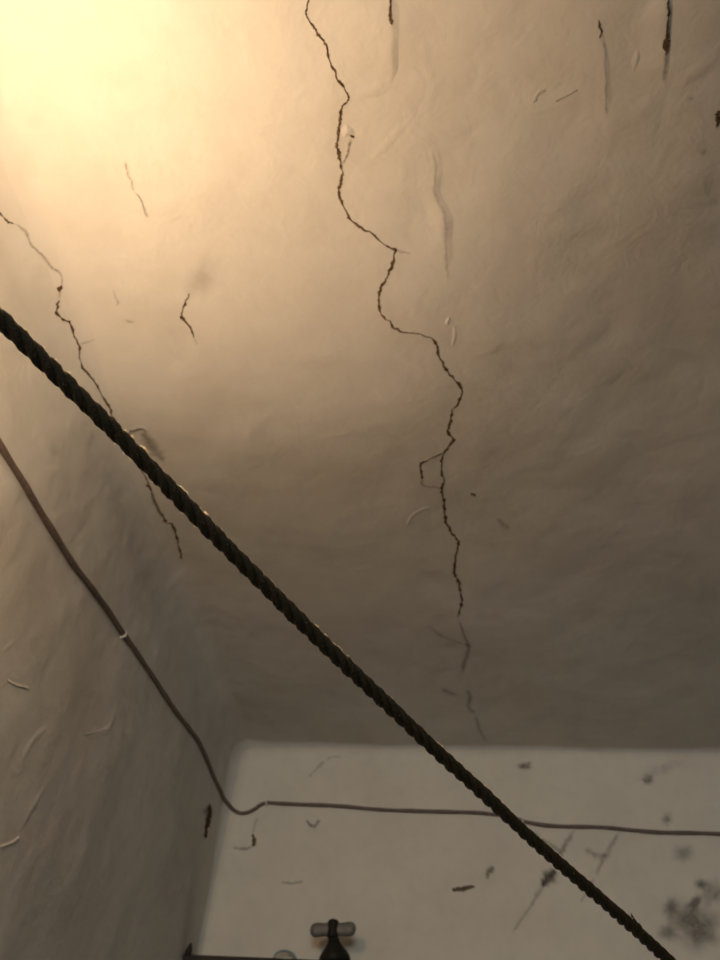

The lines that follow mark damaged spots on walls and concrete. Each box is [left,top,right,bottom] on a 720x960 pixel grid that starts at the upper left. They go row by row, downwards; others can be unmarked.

crack [592,19,612,118]
crack [634,0,674,87]
crack [55,286,112,416]
crack [180,294,194,338]
crack [305,0,463,617]
crack [141,470,182,559]